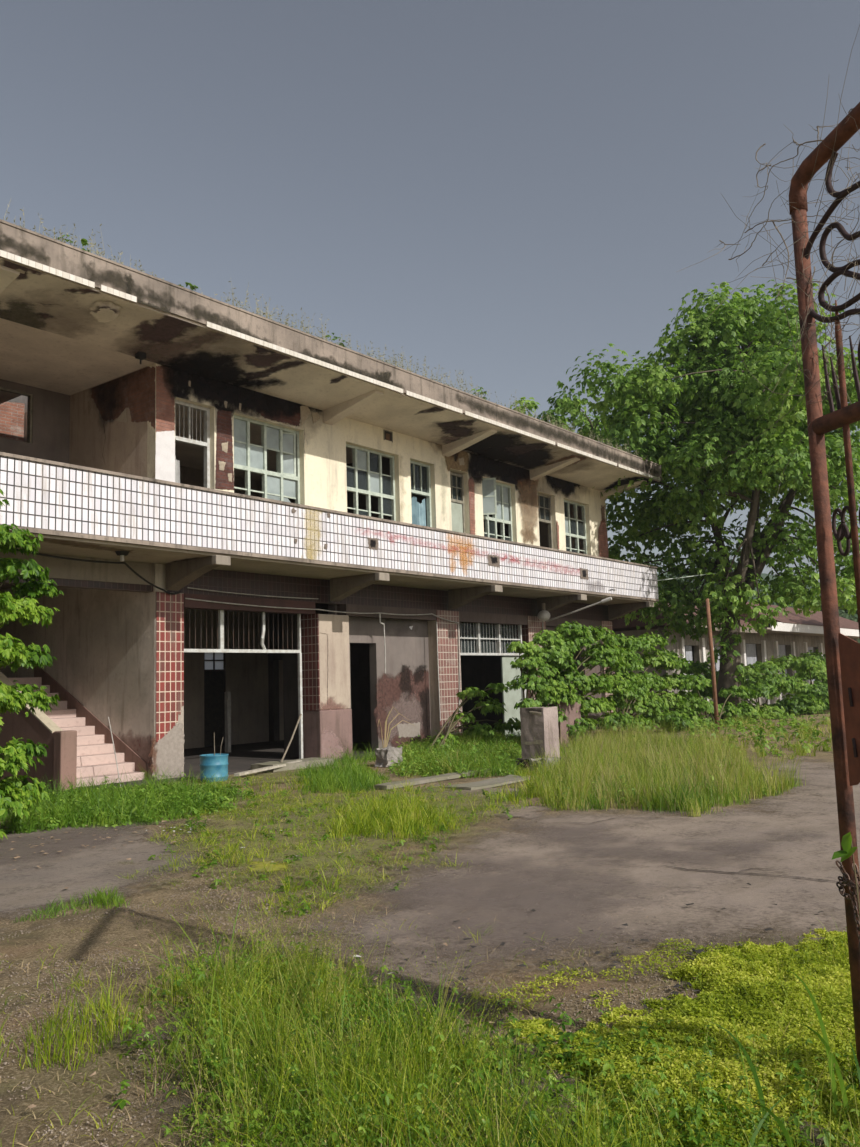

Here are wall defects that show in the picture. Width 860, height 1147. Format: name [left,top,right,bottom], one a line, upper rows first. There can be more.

water stain [0,302,46,330]
flaking render [91,316,223,432]
flaking render [260,405,320,427]
water stain [457,395,660,490]